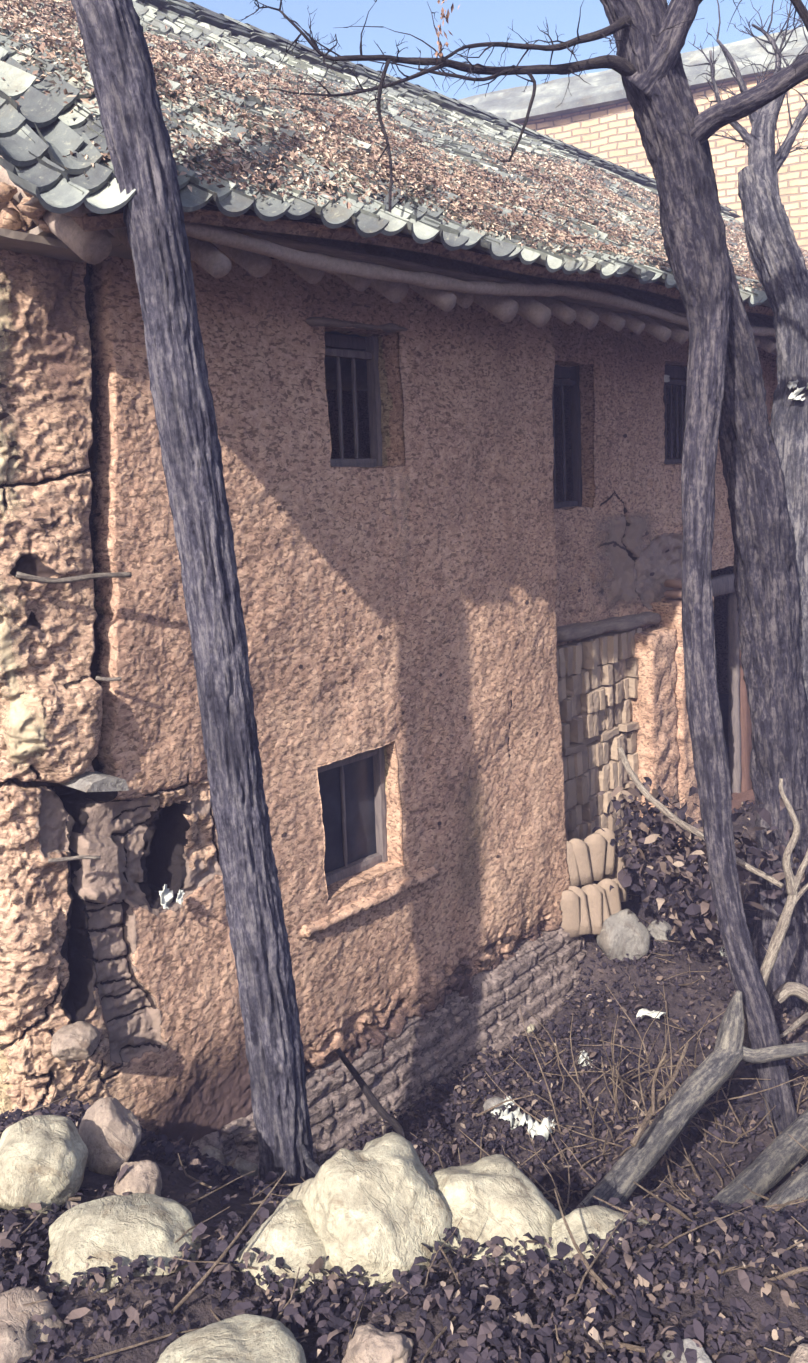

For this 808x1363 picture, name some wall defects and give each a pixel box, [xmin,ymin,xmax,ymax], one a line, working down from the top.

spalling [10,554,59,584]
crack [0,263,105,705]
crack [0,757,220,1106]
spalling [46,778,223,1064]
spalling [461,935,515,989]